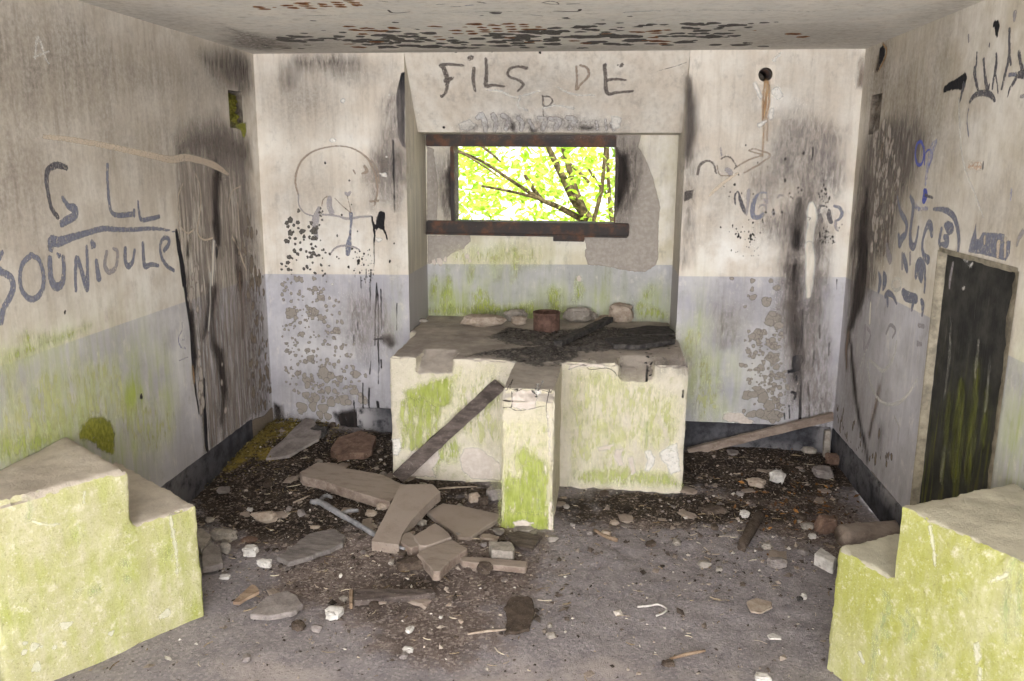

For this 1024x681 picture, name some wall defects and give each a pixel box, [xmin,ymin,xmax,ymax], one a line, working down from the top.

peeling [262,16,769,49]
corrosion [762,80,770,119]
leakage [175,159,247,452]
peeling [280,207,368,422]
peeling [723,278,790,424]
leakage [784,199,830,420]
leakage [845,189,895,499]